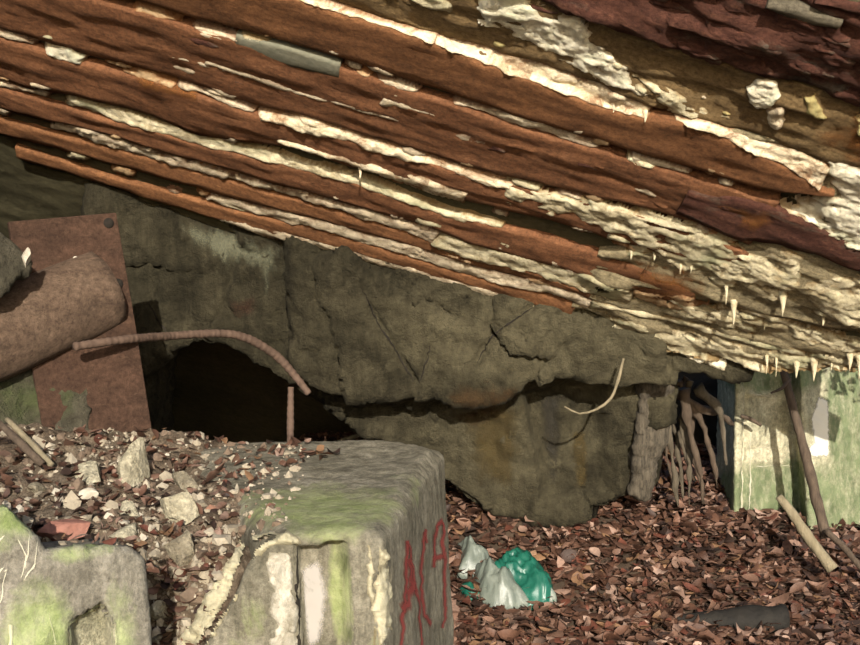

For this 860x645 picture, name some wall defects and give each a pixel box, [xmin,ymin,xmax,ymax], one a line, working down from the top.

damp [0,28,90,64]
peeling [542,0,860,99]
damp [4,81,52,97]
peeling [329,51,423,92]
peeling [626,150,655,169]
peeling [512,177,605,203]
damp [50,61,860,381]
spalling [22,247,31,268]
peeling [607,234,636,251]
spalling [72,329,311,442]
peeling [810,398,829,456]
crack [293,548,301,645]